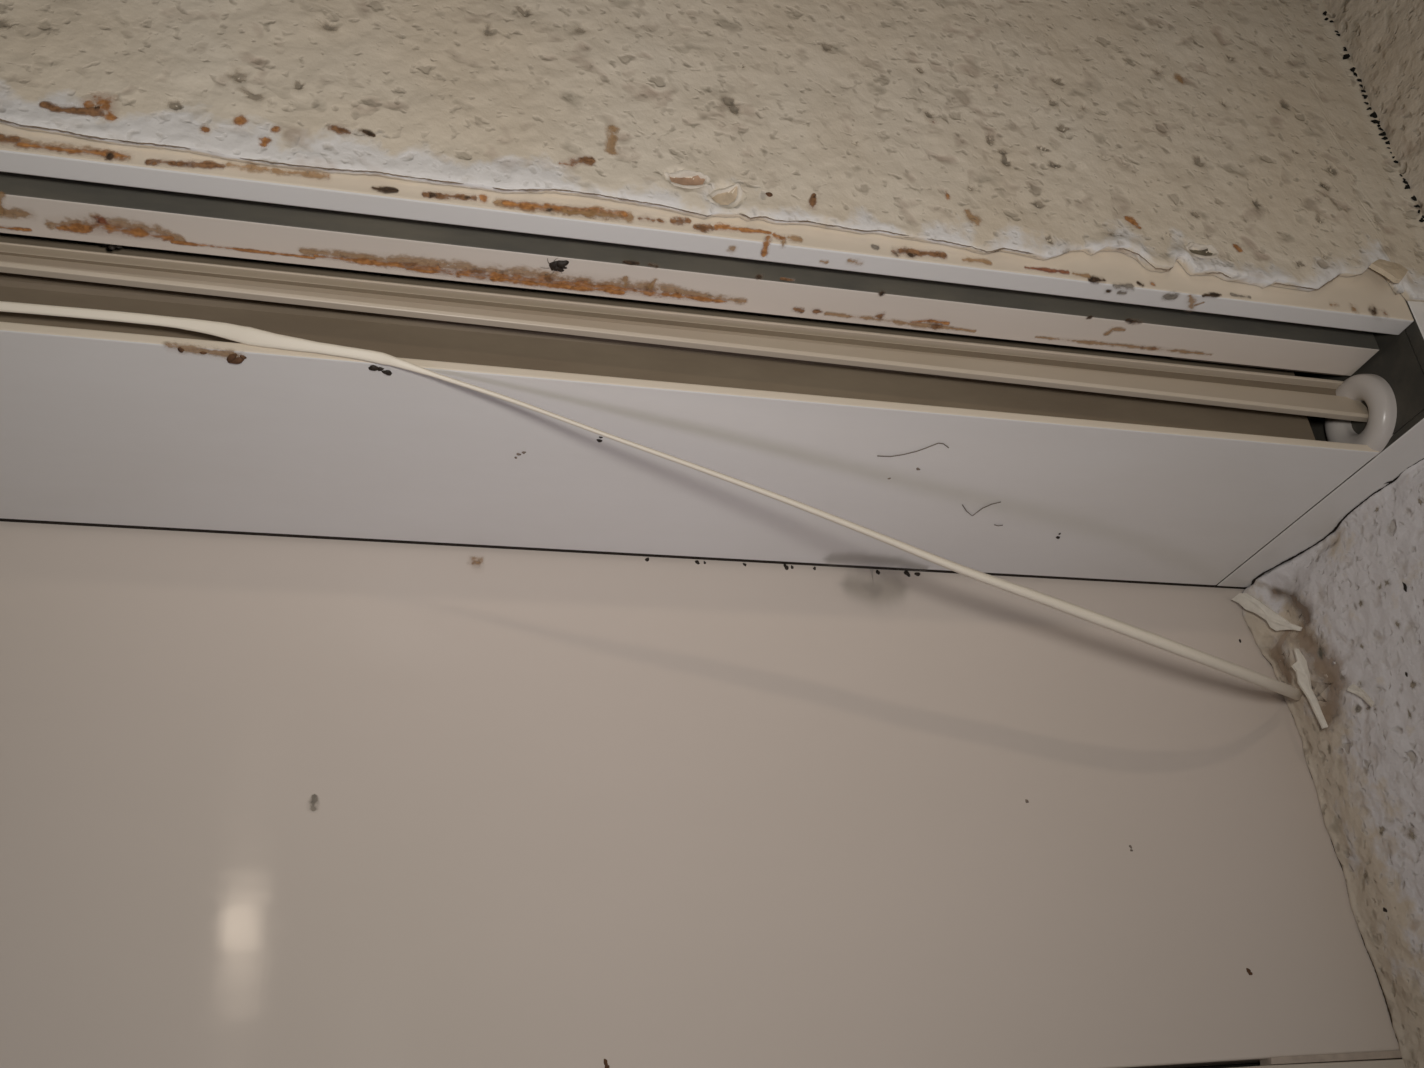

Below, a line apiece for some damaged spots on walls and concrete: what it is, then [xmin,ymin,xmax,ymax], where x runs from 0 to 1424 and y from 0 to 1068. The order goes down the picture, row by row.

spalling [987,136,1010,166]
spalling [664,170,743,208]
corrosion [0,192,803,303]
corrosion [871,244,992,265]
spalling [1185,242,1219,258]
corrosion [1025,266,1091,278]
corrosion [793,307,976,332]
corrosion [1035,327,1211,355]